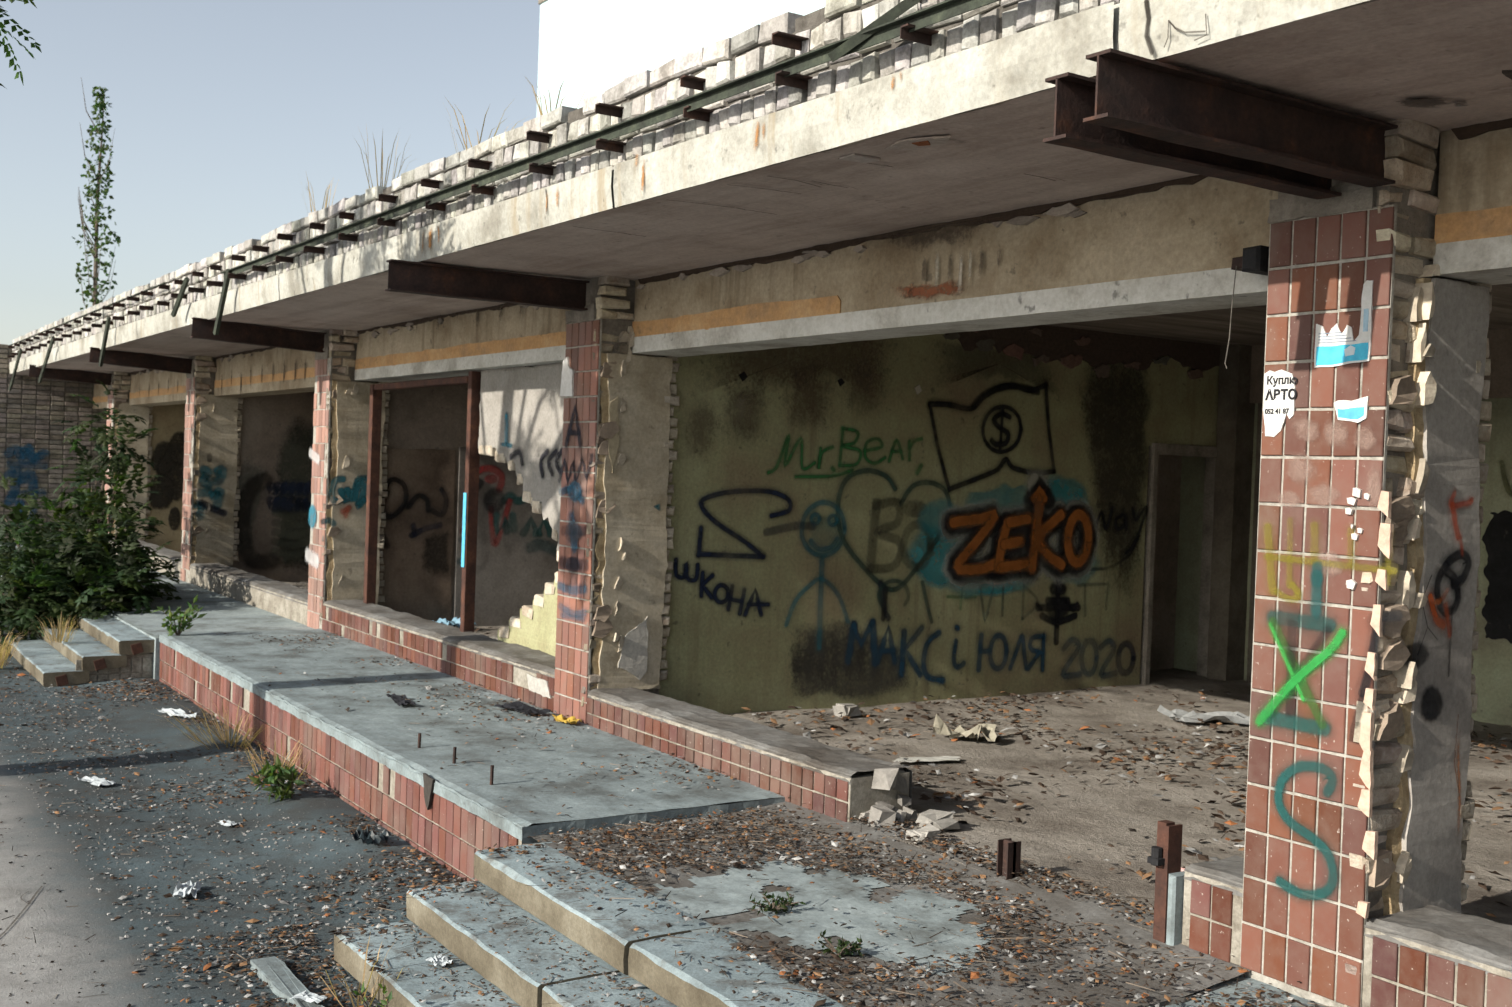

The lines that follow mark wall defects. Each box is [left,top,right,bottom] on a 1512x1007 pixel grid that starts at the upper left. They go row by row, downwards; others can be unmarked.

flaking render [323,303,542,514]
peeling [560,357,575,397]
leakage [725,341,881,437]
spalling [589,175,1220,473]
spalling [377,382,391,602]
flaking render [1345,118,1512,922]
flaking render [319,527,344,629]
spalling [489,529,559,640]
flaking render [1345,963,1357,975]